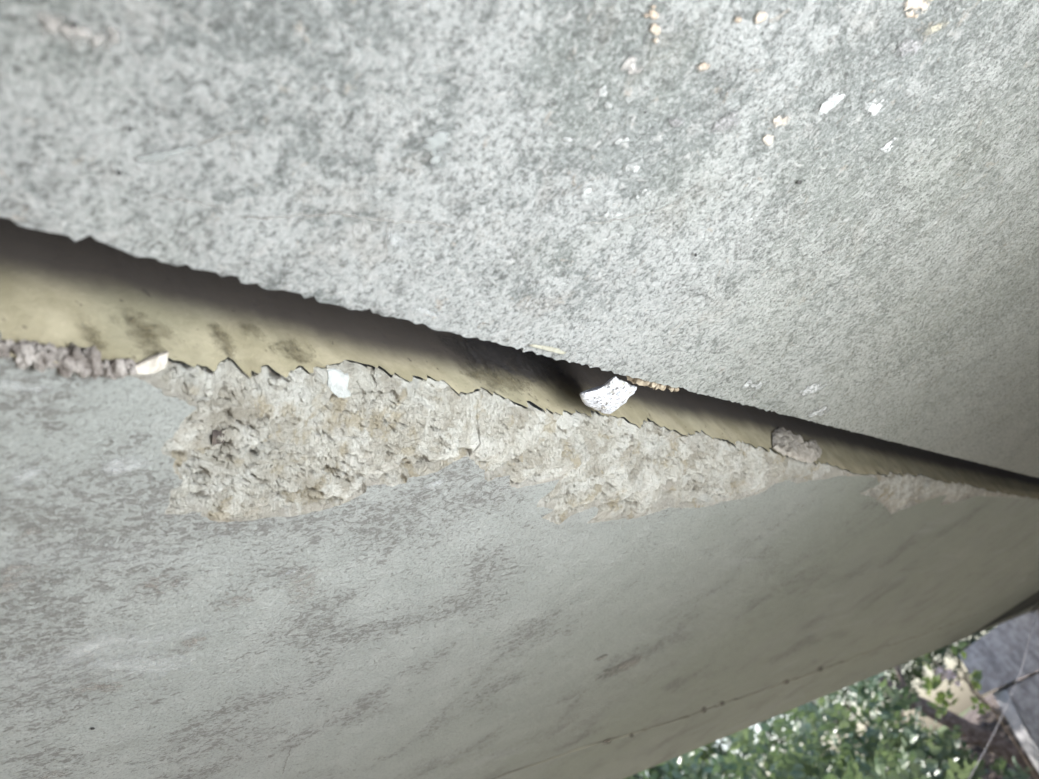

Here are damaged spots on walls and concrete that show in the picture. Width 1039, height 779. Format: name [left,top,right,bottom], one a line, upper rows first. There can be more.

spalling [0,338,1038,525]